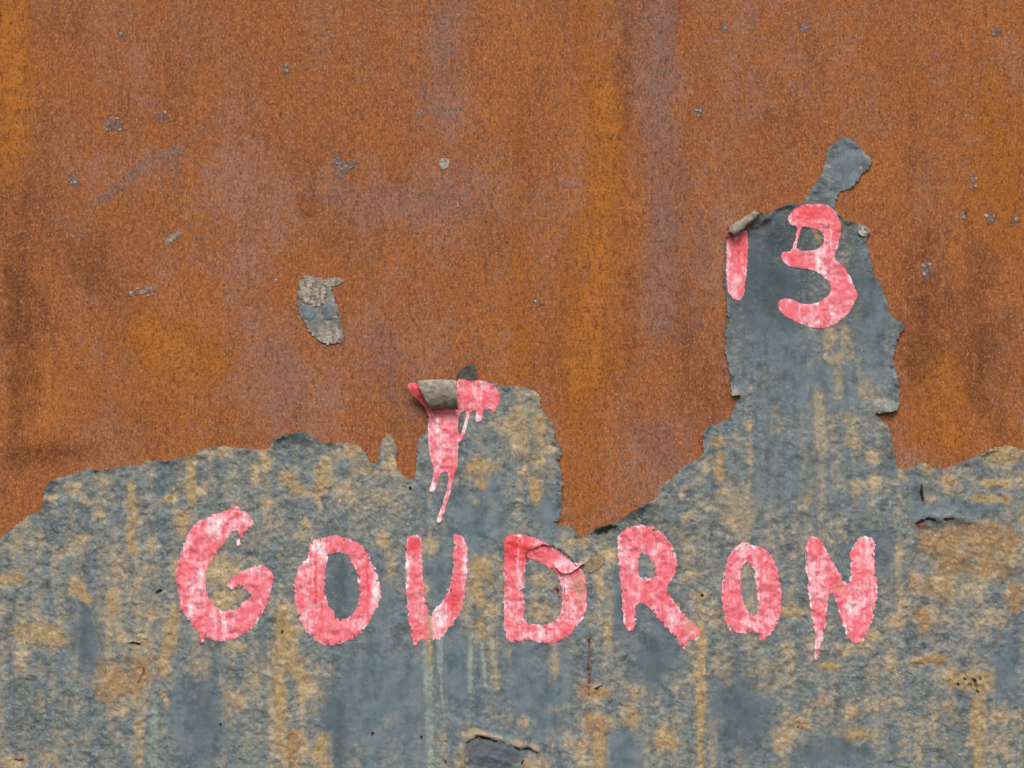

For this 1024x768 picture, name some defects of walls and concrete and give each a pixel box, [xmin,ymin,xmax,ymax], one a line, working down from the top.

rust [0,0,34,185]
rust [559,72,627,441]
peeling [418,363,482,413]
rust [812,390,829,456]
rust [126,481,138,556]
rust [712,437,725,482]
rust [973,480,1011,504]
peeling [323,550,361,622]
peeling [520,558,565,626]
peeling [585,554,605,573]
peeling [637,552,657,580]
peeling [738,560,760,617]